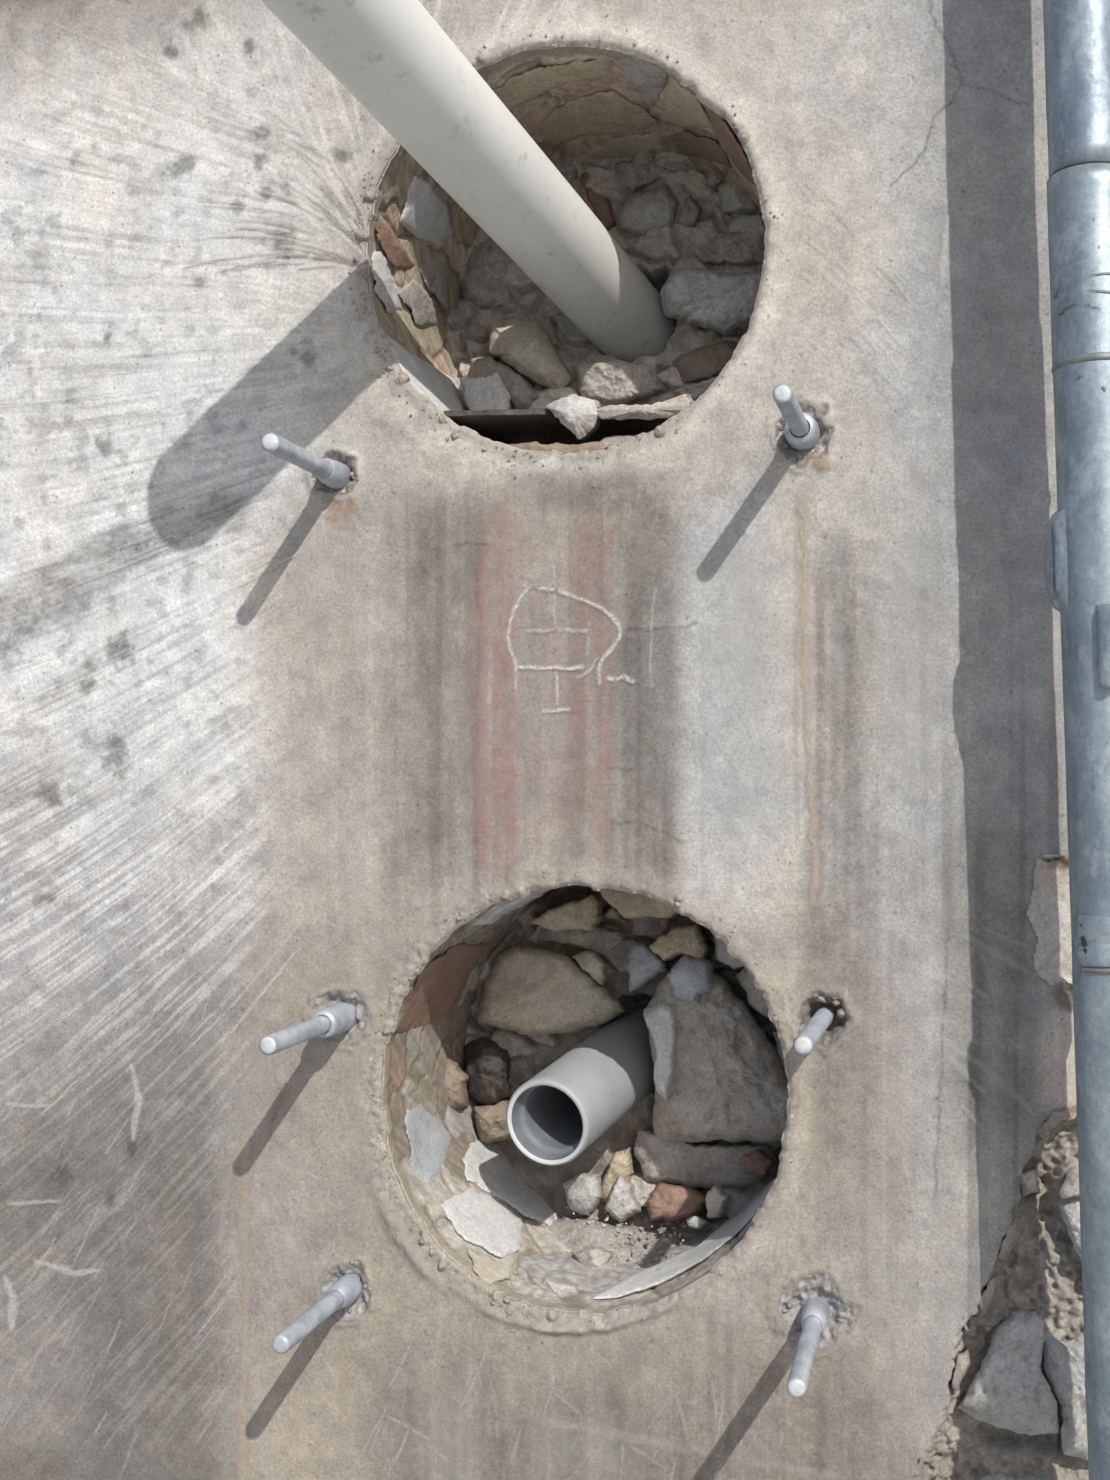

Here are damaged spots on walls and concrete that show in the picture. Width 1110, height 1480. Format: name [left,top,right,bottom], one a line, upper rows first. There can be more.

peeling [1027,854,1073,1007]
spalling [922,1108,1089,1480]